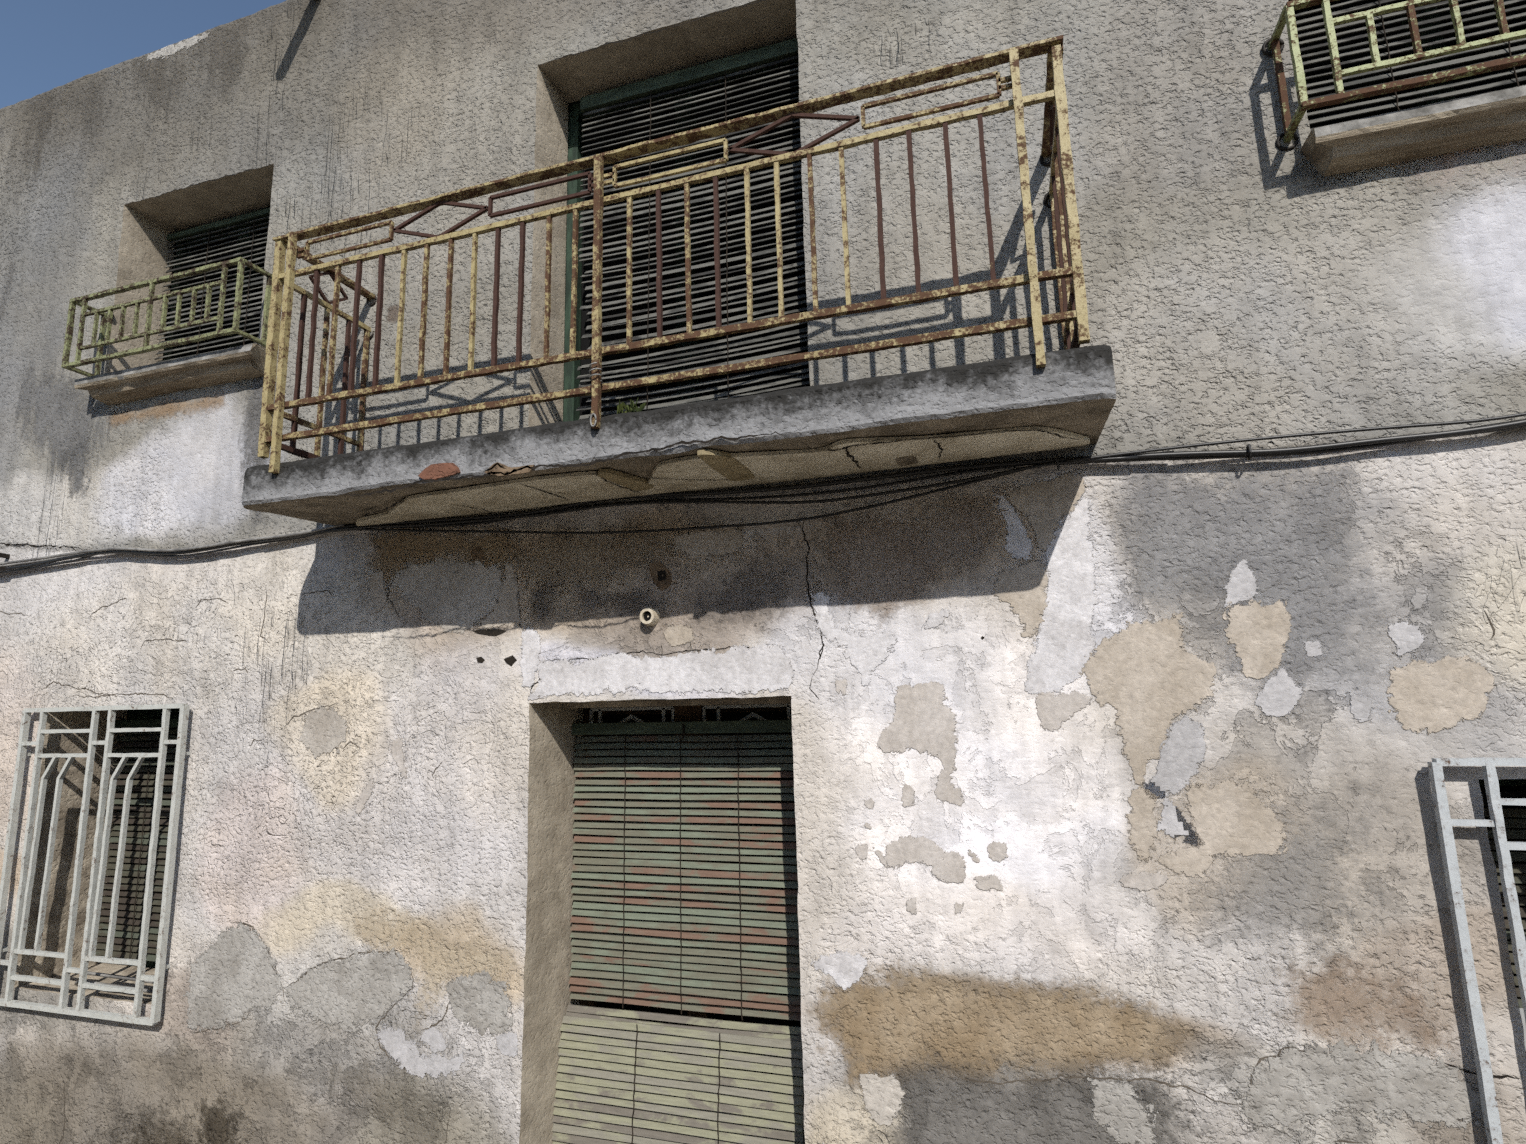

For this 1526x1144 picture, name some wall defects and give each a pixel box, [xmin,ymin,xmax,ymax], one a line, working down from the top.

damp [697,563,787,622]
damp [829,499,1002,616]
peeling [994,472,1288,878]
peeling [1222,558,1323,717]
peeling [1386,621,1495,735]
peeling [375,1023,465,1080]
damp [816,965,1190,1144]